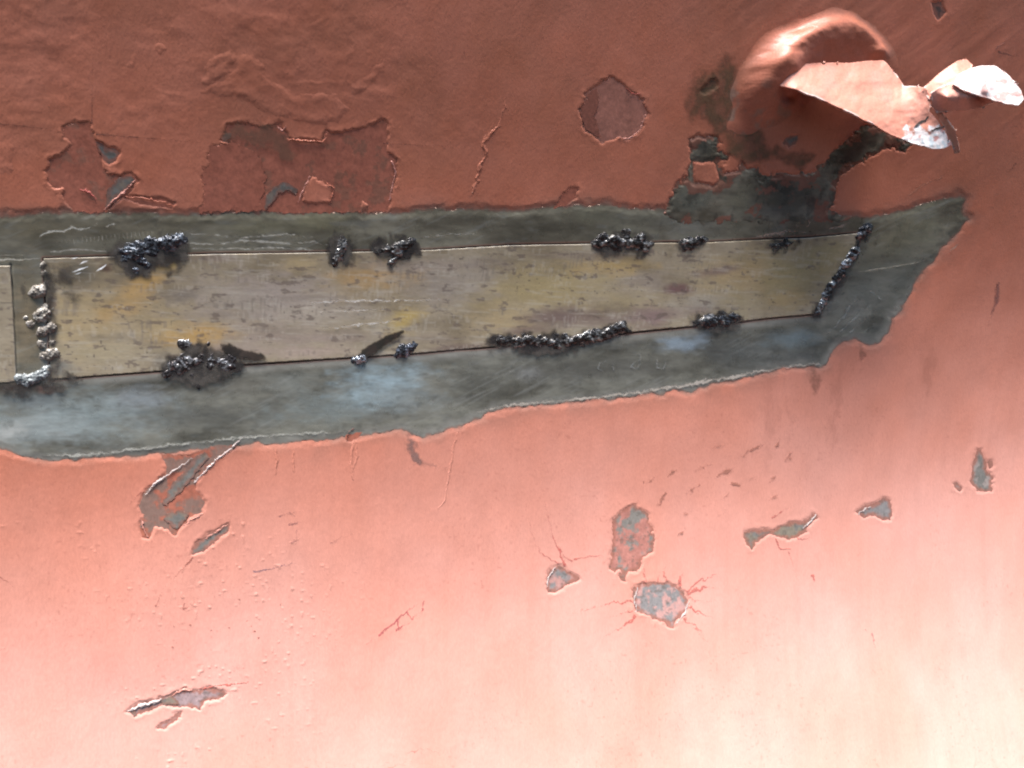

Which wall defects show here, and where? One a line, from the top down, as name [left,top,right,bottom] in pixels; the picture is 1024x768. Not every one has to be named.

peeling [47,122,175,214]
peeling [199,120,397,215]
crack [469,97,507,199]
peeling [139,437,243,538]
peeling [192,523,230,555]
peeling [546,565,580,593]
peeling [609,505,690,628]
crack [605,573,708,630]
peeling [743,514,818,550]
peeling [856,497,892,520]
peeling [953,449,994,492]
peeling [127,681,249,729]